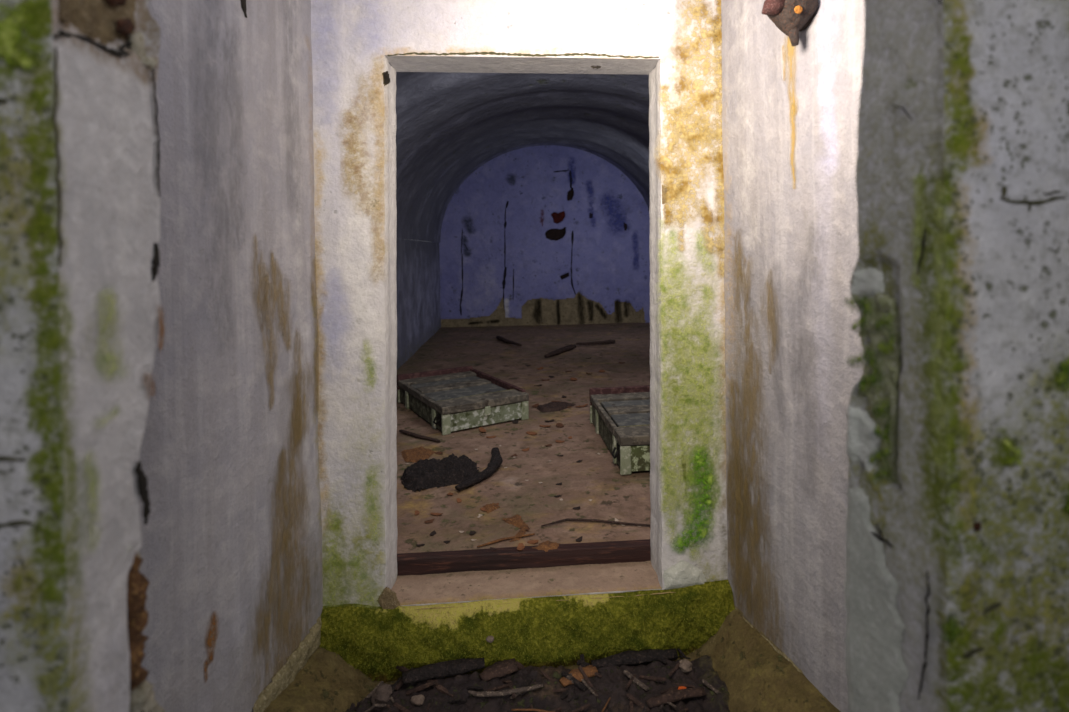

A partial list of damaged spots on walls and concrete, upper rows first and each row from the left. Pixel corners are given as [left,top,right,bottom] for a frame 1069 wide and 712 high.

spalling [58,0,158,69]
crack [240,0,248,18]
rust [783,37,795,184]
crack [1001,185,1067,211]
crack [0,454,26,462]
crack [0,520,34,528]
leakage [255,240,319,677]
peeling [441,292,646,327]
leakage [691,286,717,508]
spalling [845,267,902,487]
spalling [127,545,166,712]
peeling [844,486,909,712]